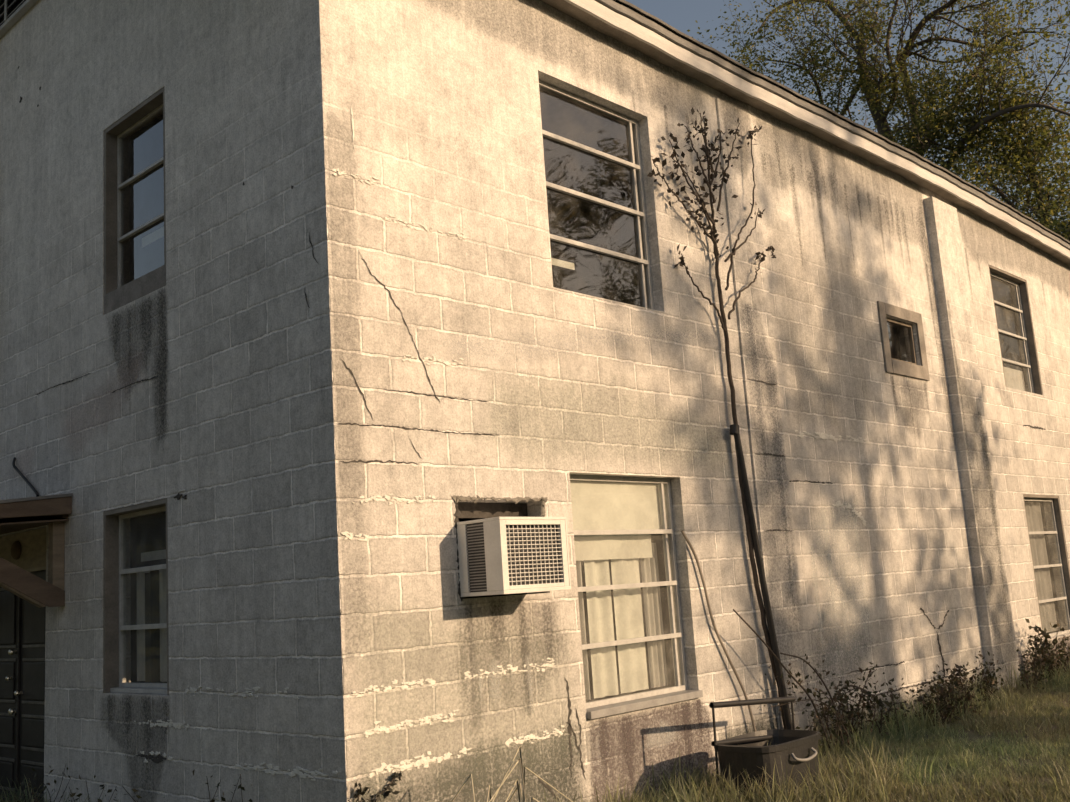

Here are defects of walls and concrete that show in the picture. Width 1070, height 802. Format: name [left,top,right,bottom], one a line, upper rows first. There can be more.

crack [338,252,496,465]
peeling [464,658,555,679]
peeling [351,677,436,698]
peeling [363,709,459,738]
peeling [505,725,565,747]
peeling [369,747,472,778]